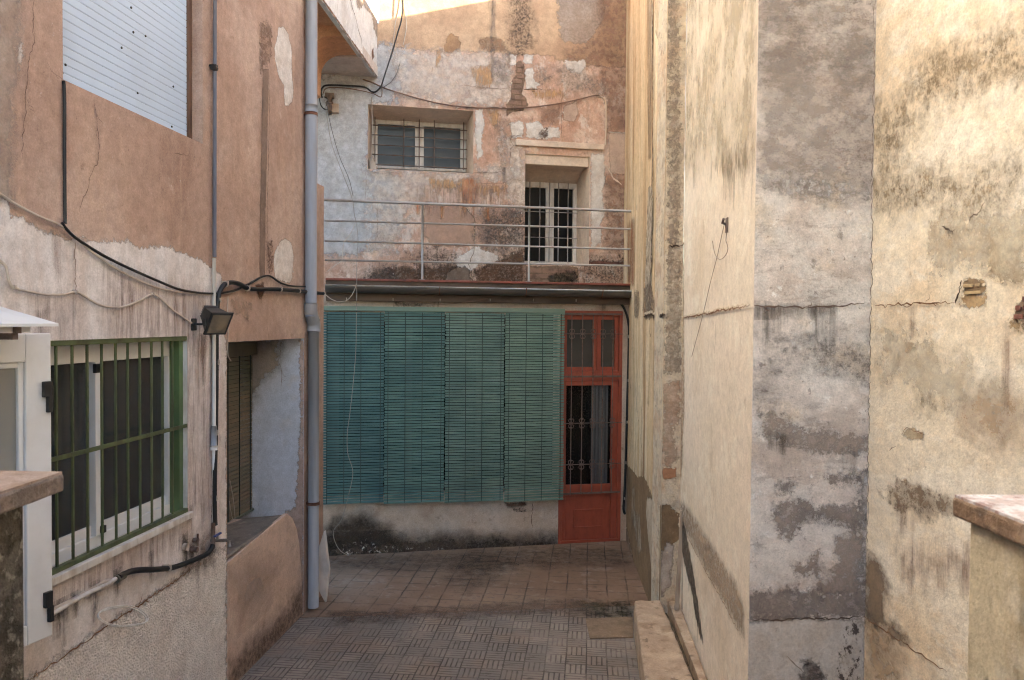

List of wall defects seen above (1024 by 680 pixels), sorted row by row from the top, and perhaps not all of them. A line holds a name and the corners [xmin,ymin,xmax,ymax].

crack [21,2,58,157]
crack [80,105,103,207]
spalling [479,37,540,124]
leakage [666,0,1024,245]
leakage [363,209,526,282]
spalling [634,185,682,479]
crack [644,0,962,554]
spalling [959,278,987,309]
peeling [0,198,227,680]
leakage [326,514,557,556]
leakage [626,466,908,680]
leakage [889,479,953,521]